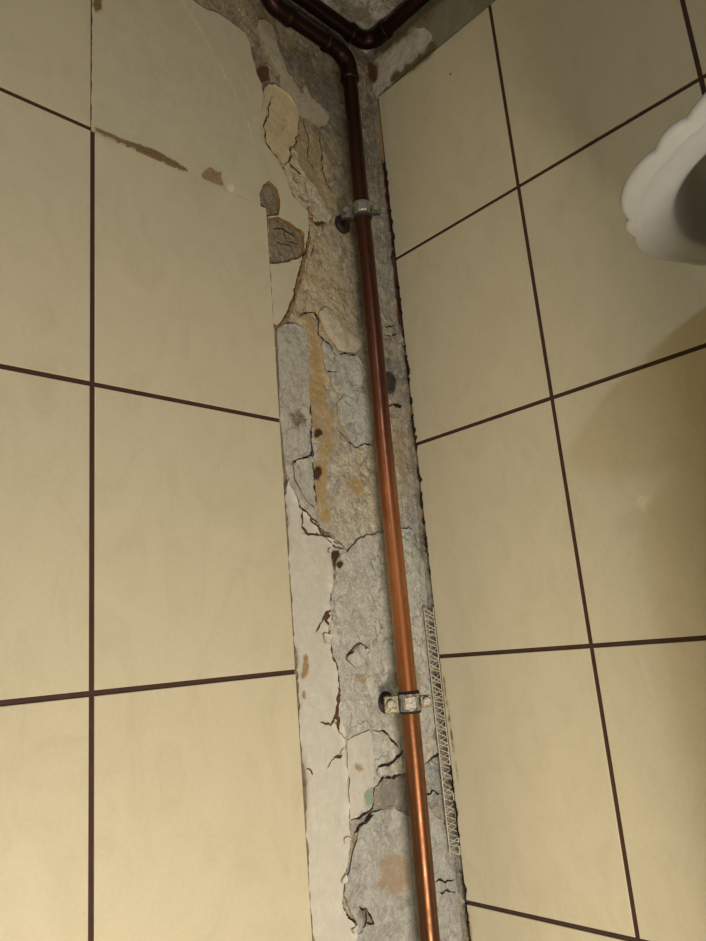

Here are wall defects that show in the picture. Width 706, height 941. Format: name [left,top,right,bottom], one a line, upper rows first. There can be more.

peeling [372,27,433,100]
crack [183,0,355,373]
peeling [90,0,420,941]
crack [290,405,344,550]
crack [383,144,435,612]
crack [307,573,368,775]
peeling [401,529,439,763]
crack [342,890,374,934]
crack [350,730,404,834]
peeling [428,806,462,941]
crack [424,753,471,941]